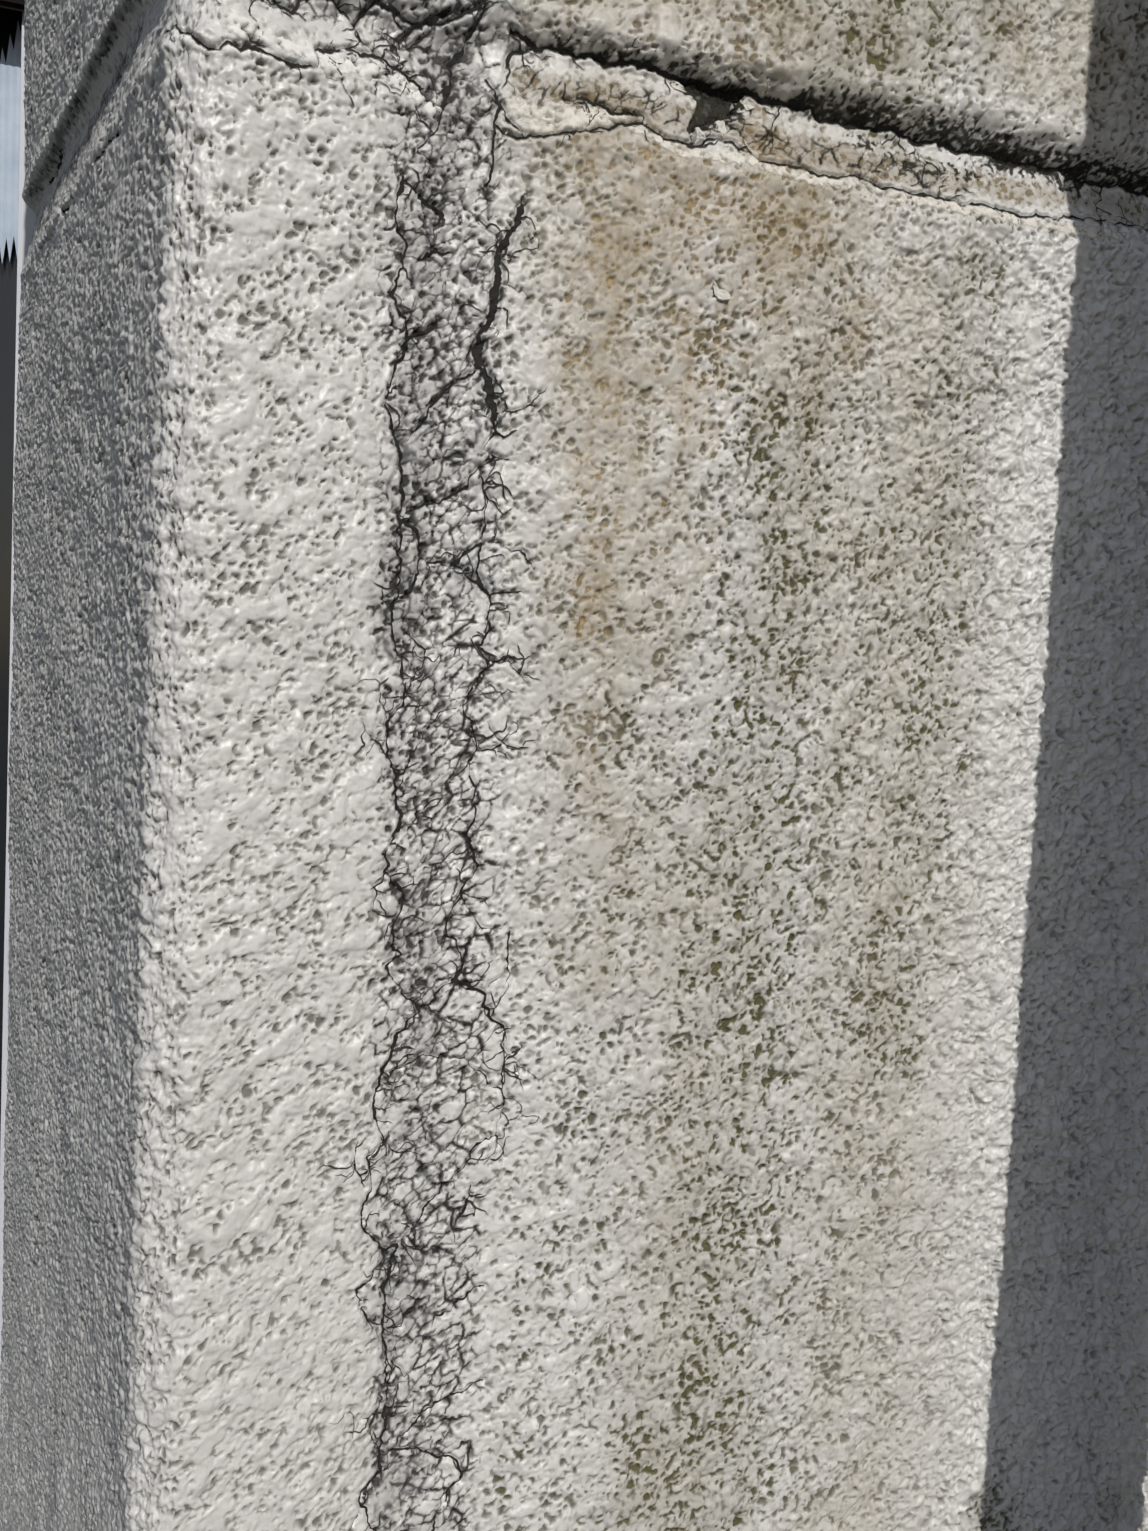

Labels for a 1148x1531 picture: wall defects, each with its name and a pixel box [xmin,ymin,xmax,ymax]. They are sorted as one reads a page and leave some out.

crack [159,0,313,81]
crack [306,0,1148,1531]